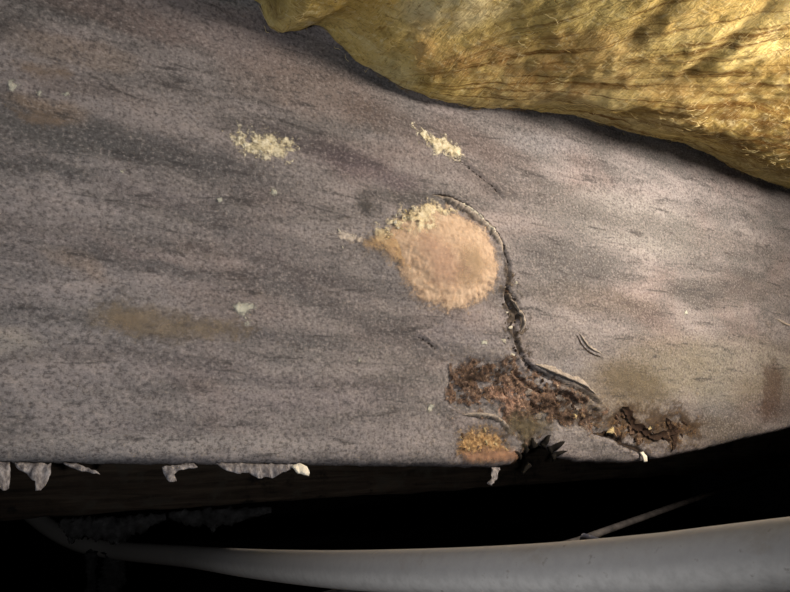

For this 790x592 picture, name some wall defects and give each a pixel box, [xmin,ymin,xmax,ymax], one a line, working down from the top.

spalling [338,194,506,311]
crack [499,252,595,402]
crack [577,332,602,357]
corrosion [457,426,517,462]
corrosion [574,402,701,462]
peeling [0,462,51,491]
peeling [62,462,100,475]
peeling [162,463,197,482]
peeling [216,462,310,479]